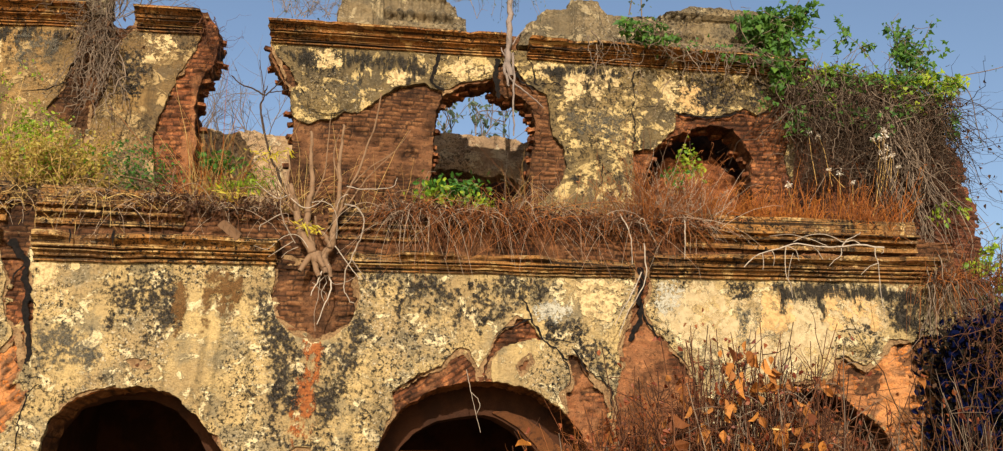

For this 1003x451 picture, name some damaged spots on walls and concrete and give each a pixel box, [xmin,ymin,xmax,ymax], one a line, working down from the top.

leakage [287,48,428,85]
flaking render [289,59,566,215]
flaking render [534,63,620,105]
flaking render [633,72,793,217]
crack [7,238,54,451]
flaking render [0,229,80,433]
flaking render [271,255,360,343]
leakage [245,271,621,451]
crack [496,299,613,414]
crack [628,267,658,342]
flaking render [382,268,956,451]
leakage [725,279,927,364]